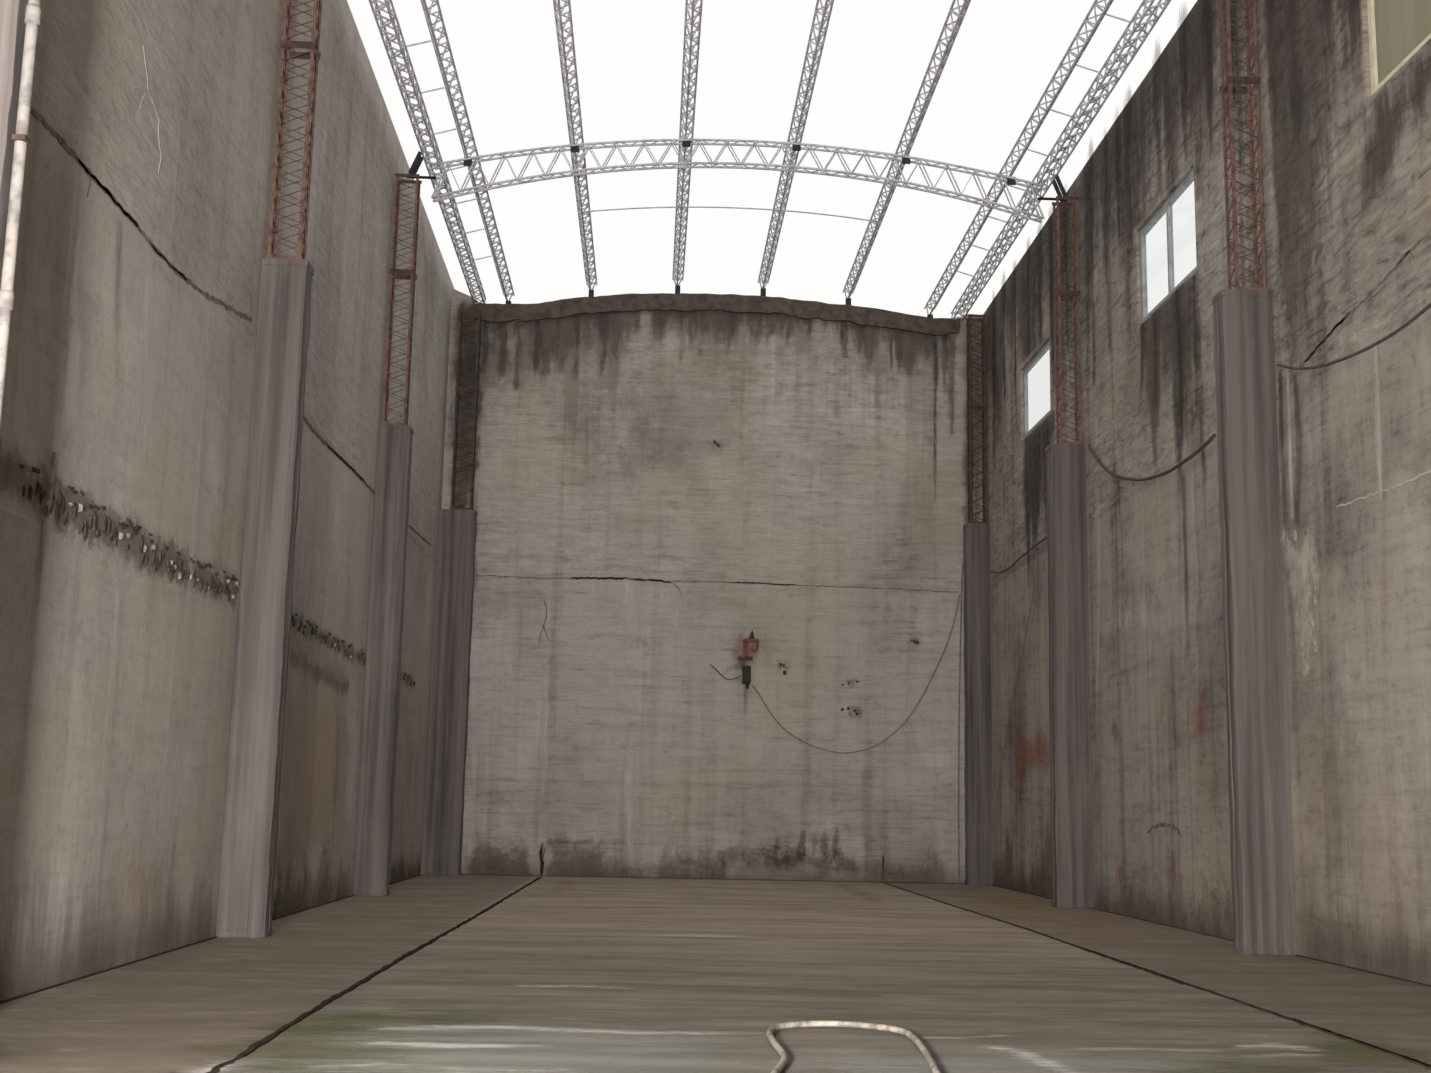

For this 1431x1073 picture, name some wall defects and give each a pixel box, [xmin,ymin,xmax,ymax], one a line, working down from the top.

crack [30,107,252,322]
crack [139,45,162,173]
water stain [1267,0,1333,323]
water stain [1366,66,1428,190]
water stain [482,310,812,370]
water stain [841,321,954,403]